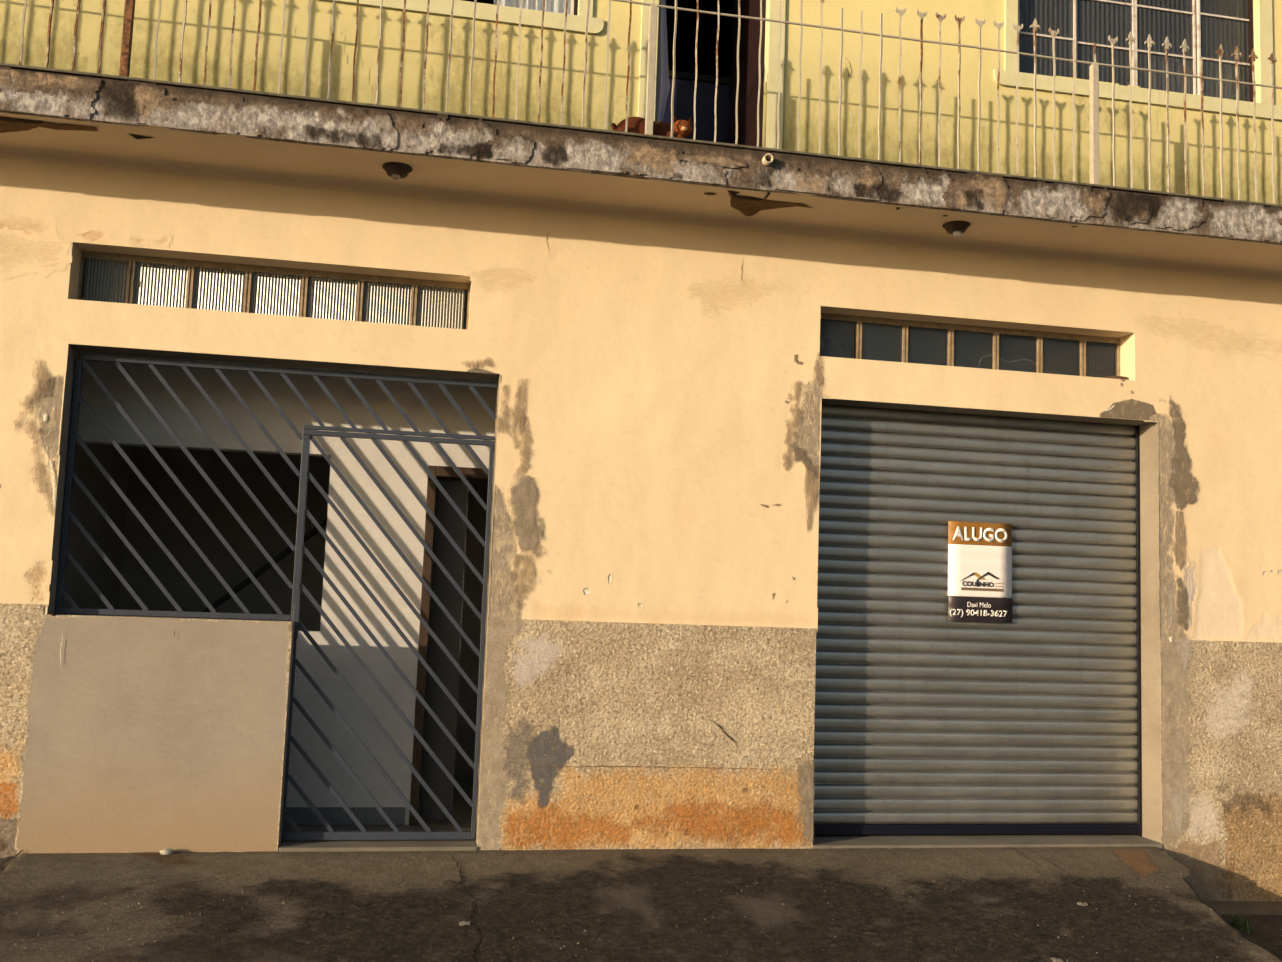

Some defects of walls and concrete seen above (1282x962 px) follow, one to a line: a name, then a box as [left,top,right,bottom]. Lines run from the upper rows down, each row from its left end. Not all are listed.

peeling [0,66,101,133]
water stain [0,0,621,130]
peeling [122,81,1282,243]
spalling [1100,379,1157,420]
water stain [499,722,814,850]